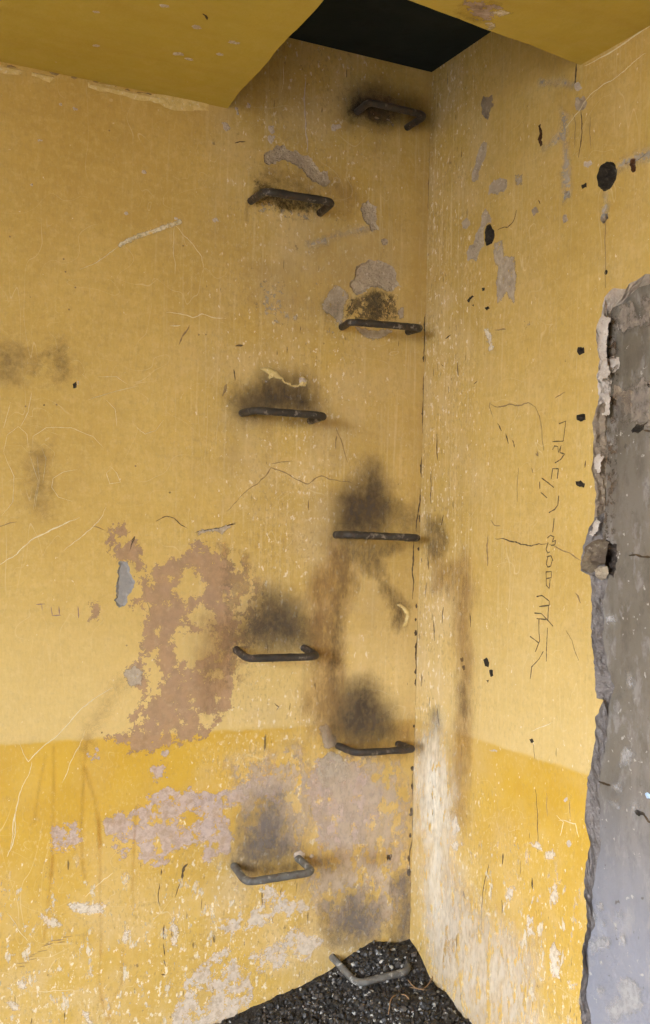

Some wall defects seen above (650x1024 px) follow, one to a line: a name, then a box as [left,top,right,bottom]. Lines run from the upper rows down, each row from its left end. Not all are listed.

flaking render [481,95,494,120]
flaking render [257,120,330,187]
flaking render [471,142,522,195]
crack [157,428,351,535]
flaking render [86,208,650,1024]
peeling [50,821,83,853]
peeling [5,881,113,1023]